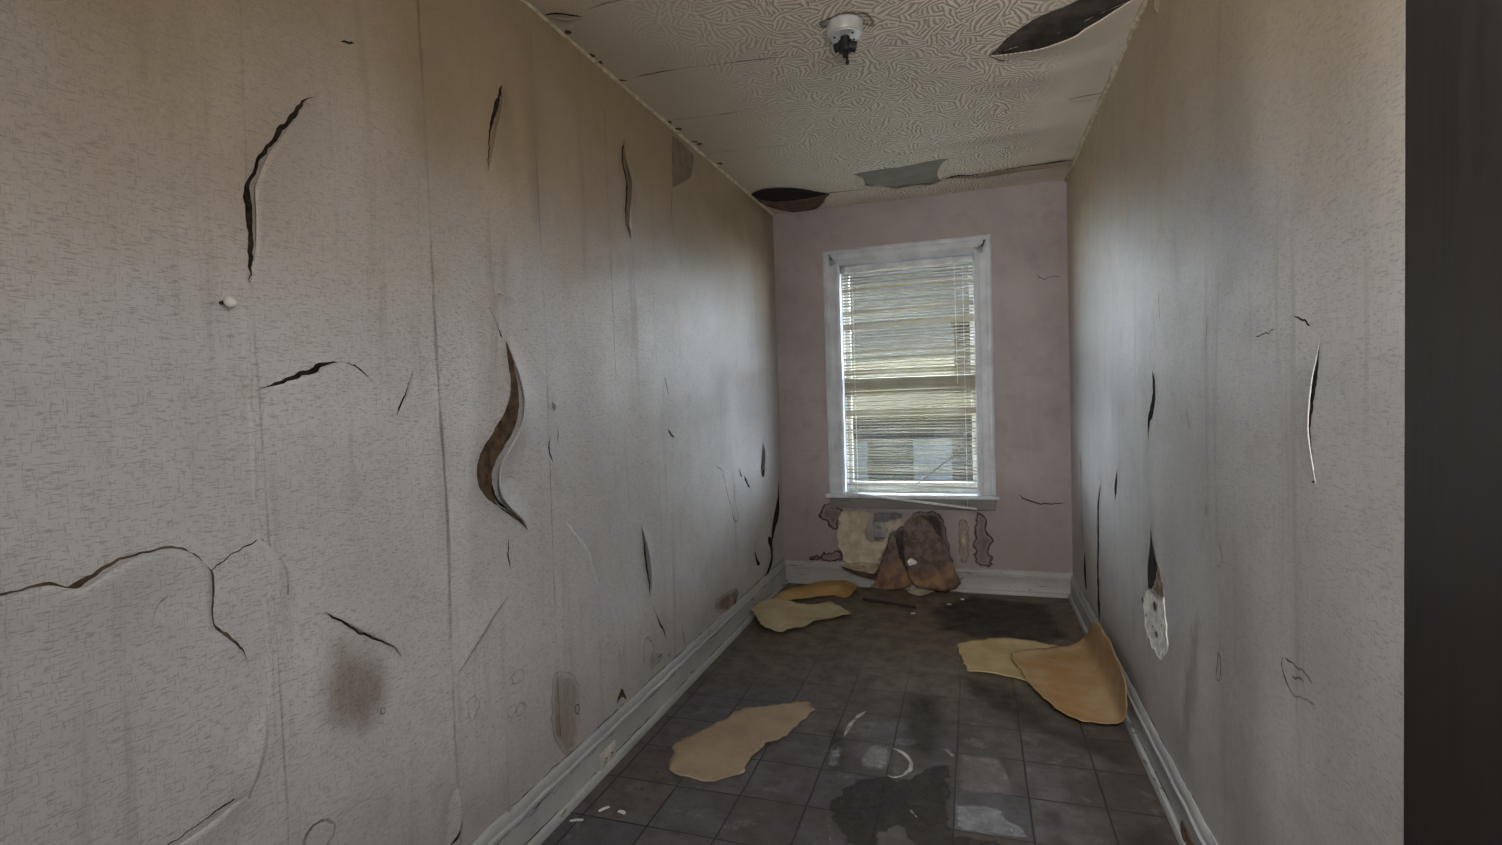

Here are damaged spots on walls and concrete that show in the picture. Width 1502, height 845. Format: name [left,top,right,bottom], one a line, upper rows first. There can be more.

flaking render [836,509,905,564]